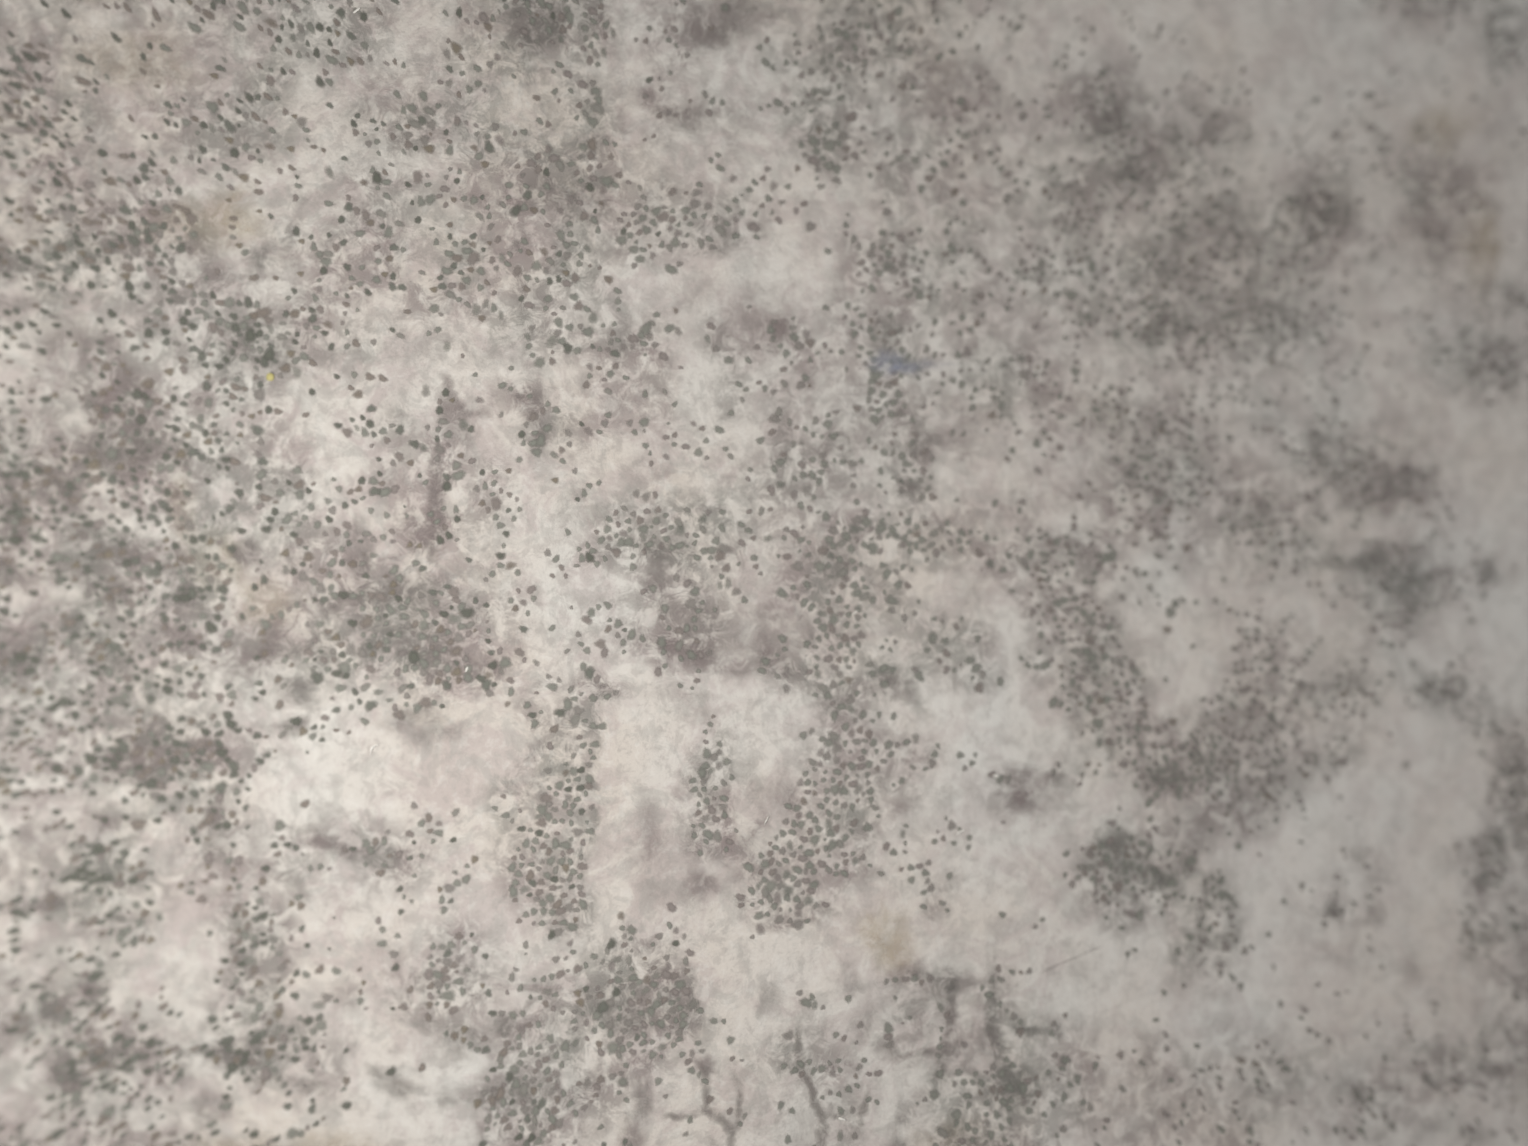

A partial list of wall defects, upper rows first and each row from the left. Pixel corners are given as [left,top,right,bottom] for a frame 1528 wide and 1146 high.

damp [565,0,1368,967]
damp [0,0,759,1146]
damp [884,1016,912,1047]
damp [981,965,1023,1036]
damp [782,1059,859,1114]
damp [916,1005,1110,1146]
damp [1164,1065,1259,1146]